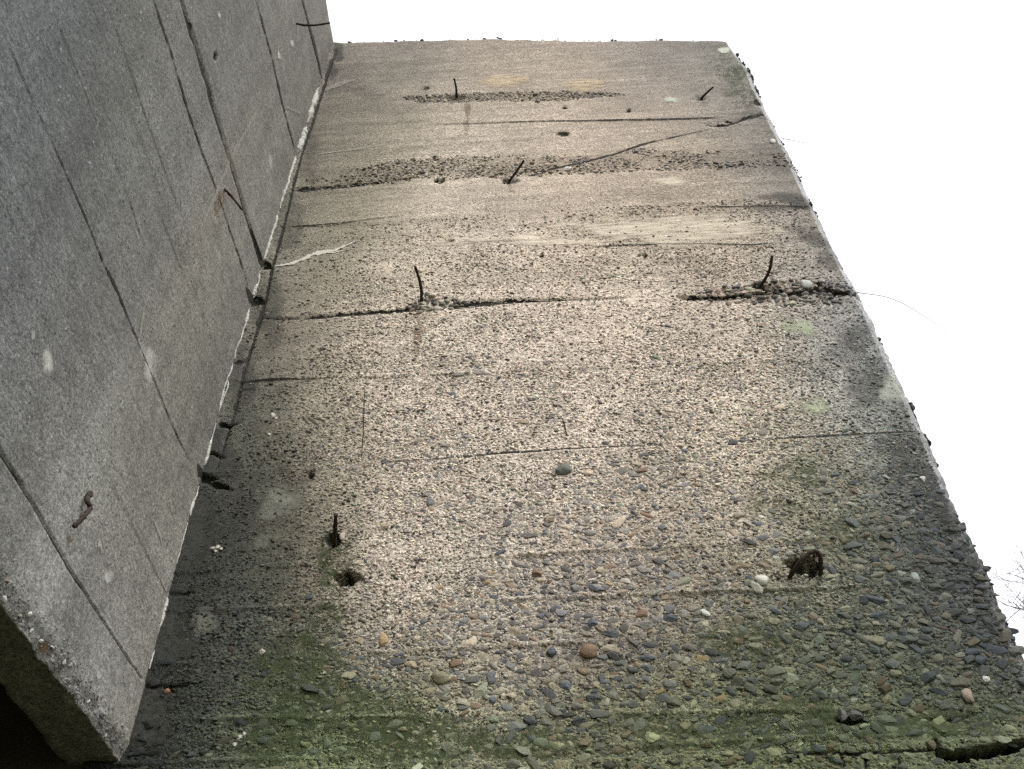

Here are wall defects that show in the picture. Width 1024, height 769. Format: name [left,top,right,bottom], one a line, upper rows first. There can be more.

crack [449,114,764,176]
damp [203,43,355,470]
crack [448,299,615,309]
damp [880,378,902,400]
spalling [0,197,1024,769]
damp [176,486,206,564]
damp [149,597,192,669]
crack [780,714,981,769]